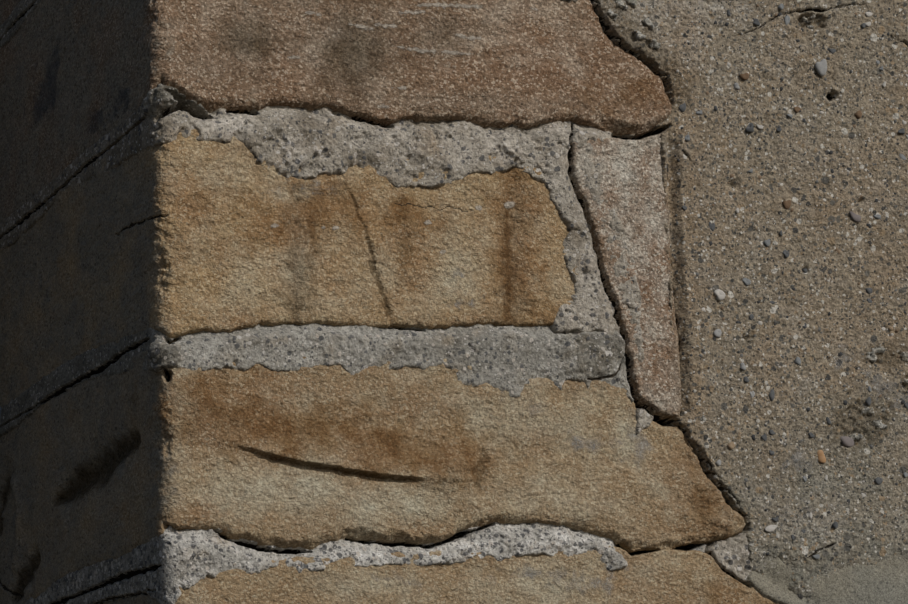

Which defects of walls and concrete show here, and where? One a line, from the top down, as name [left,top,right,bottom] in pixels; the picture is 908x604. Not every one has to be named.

crack [738,0,863,35]
crack [567,124,585,217]
crack [116,214,168,236]
crack [587,243,749,524]
crack [95,589,156,604]